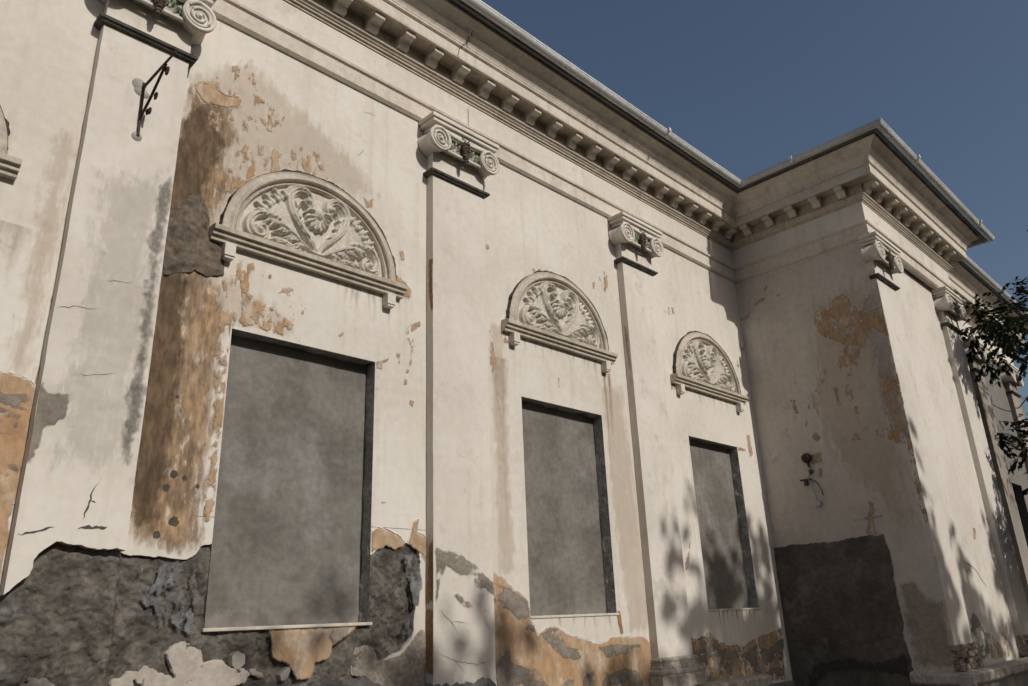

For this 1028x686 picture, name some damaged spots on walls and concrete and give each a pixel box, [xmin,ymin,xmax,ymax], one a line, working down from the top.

peeling [194,64,285,132]
peeling [225,144,324,193]
leakage [124,86,235,551]
peeling [204,263,294,521]
peeling [812,292,889,414]
peeling [873,363,928,522]
crack [78,486,108,530]
spalling [0,370,427,686]
peeling [493,573,652,686]
peeling [691,627,785,682]